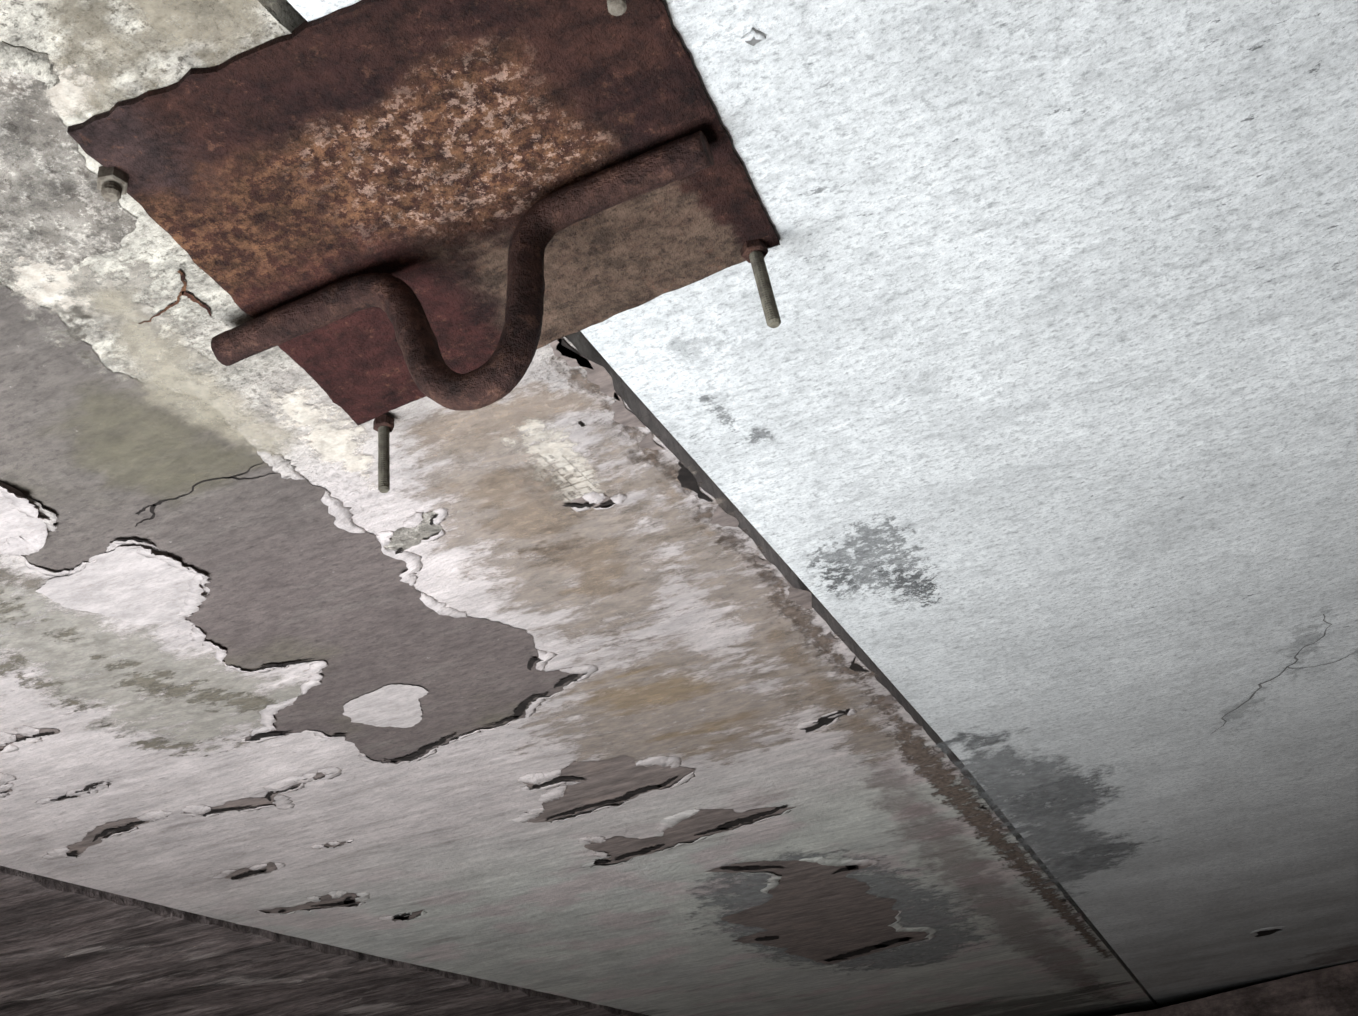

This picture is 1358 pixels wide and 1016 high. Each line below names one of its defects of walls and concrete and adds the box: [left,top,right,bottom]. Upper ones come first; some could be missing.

peeling [0,42,598,765]
damp [503,419,602,502]
damp [0,569,301,756]
spalling [550,338,1112,964]
peeling [0,772,16,798]
peeling [35,767,342,860]
peeling [512,755,695,823]
damp [938,733,1144,906]
damp [696,852,986,972]